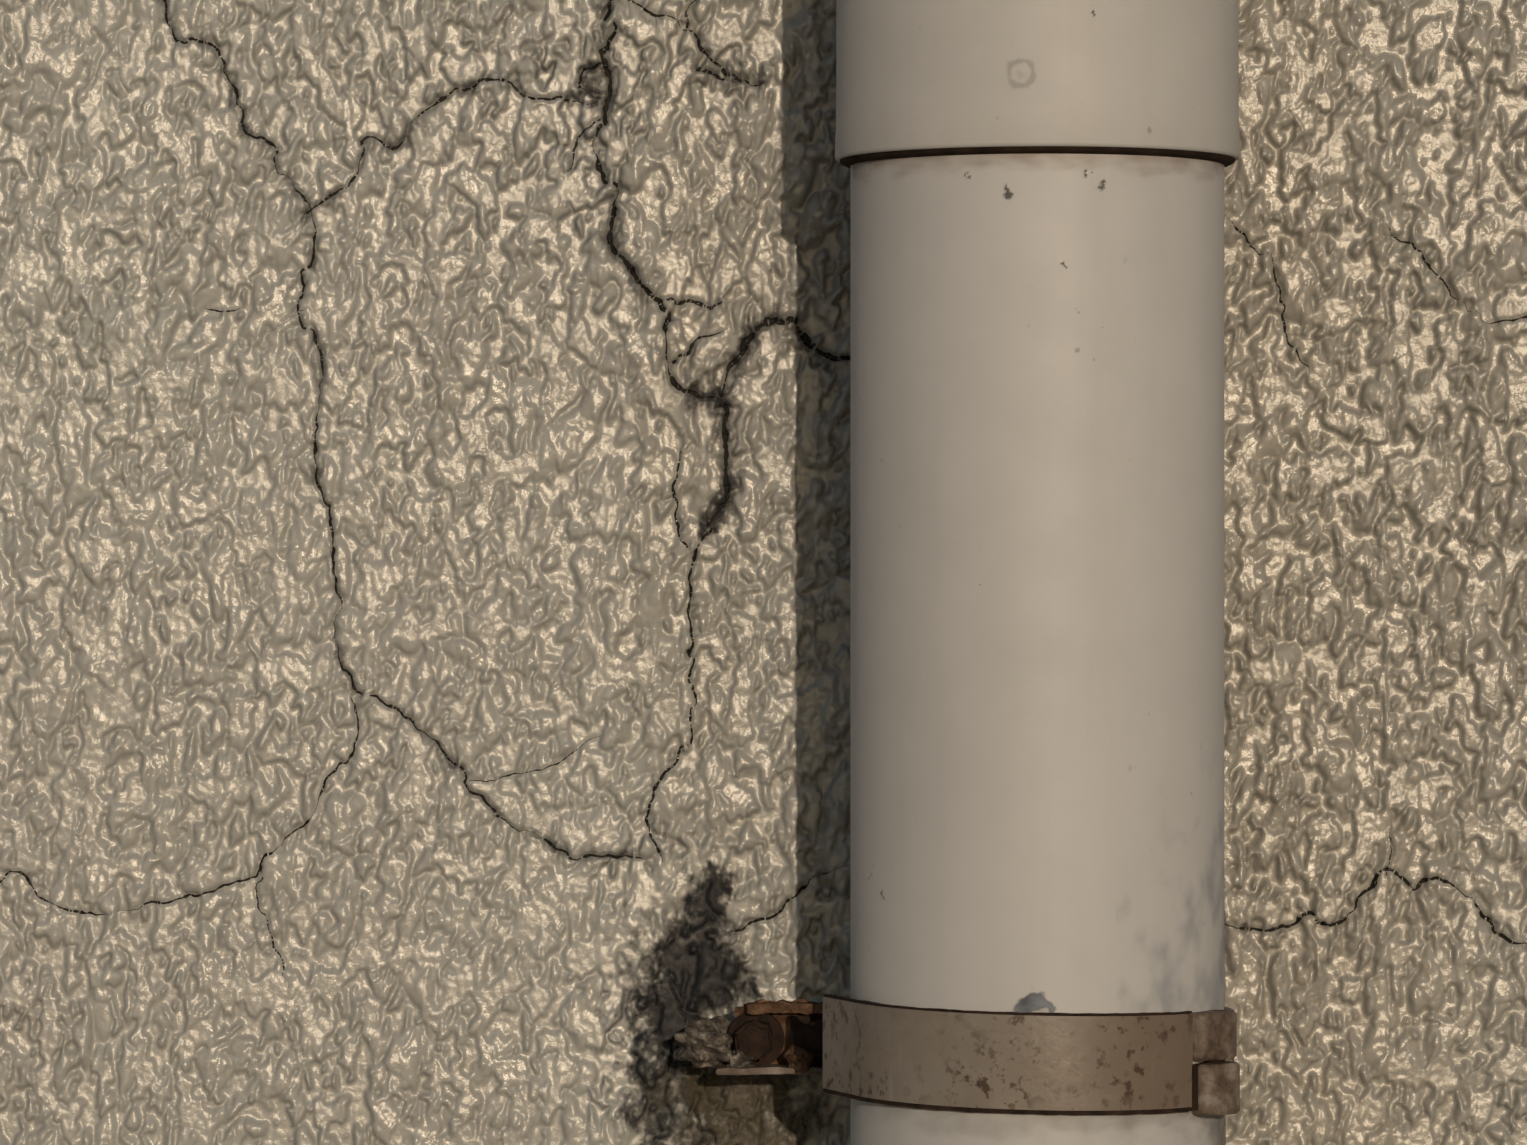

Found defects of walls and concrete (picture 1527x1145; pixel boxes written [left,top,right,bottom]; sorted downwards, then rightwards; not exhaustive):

crack [0,0,851,987]
leakage [620,861,762,1145]
corrosion [651,1044,1205,1145]
crack [1225,829,1527,945]